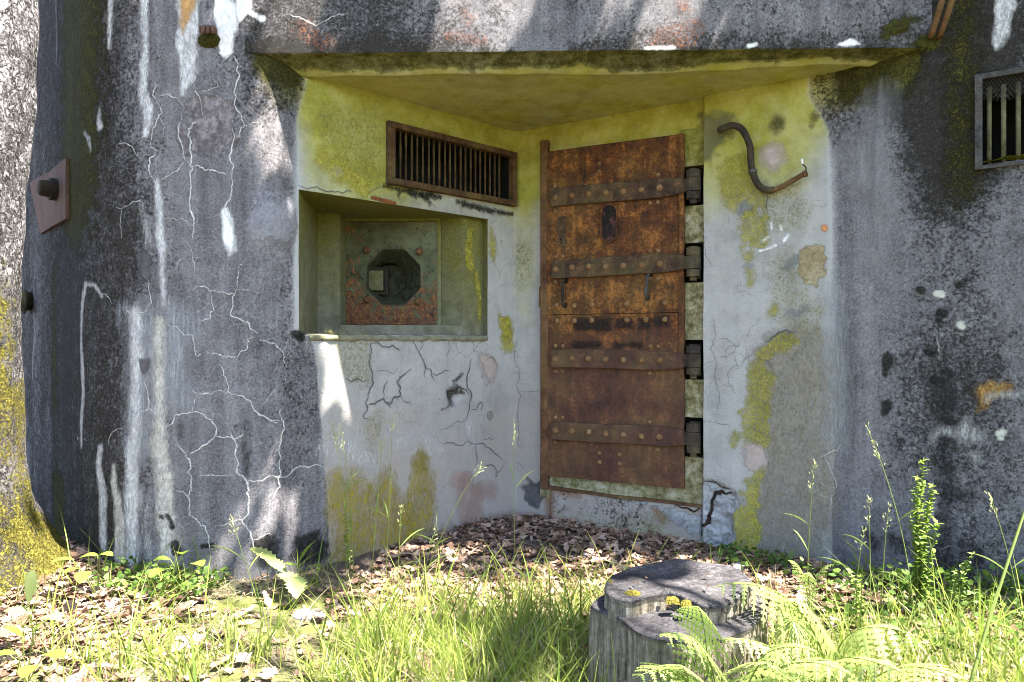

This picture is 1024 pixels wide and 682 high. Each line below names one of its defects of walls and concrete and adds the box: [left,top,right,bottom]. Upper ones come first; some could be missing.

efflorescence [139,0,153,137]
efflorescence [175,0,198,95]
efflorescence [214,0,265,57]
efflorescence [221,208,235,254]
crack [81,59,321,549]
water stain [914,277,970,331]
water stain [80,282,103,447]
water stain [96,180,194,567]
crack [341,333,539,477]
crack [704,321,798,425]
rust [978,382,1012,408]
crack [675,467,732,536]